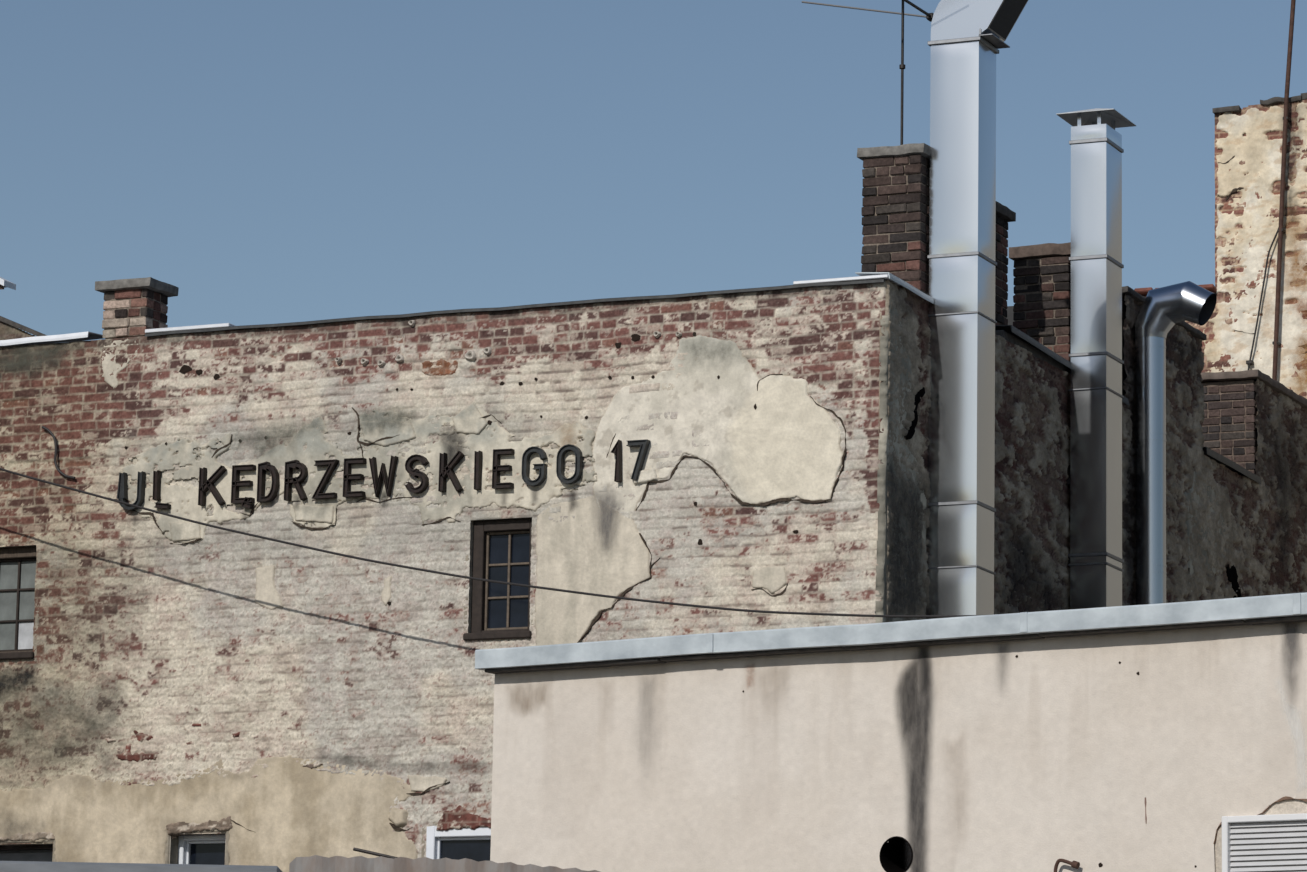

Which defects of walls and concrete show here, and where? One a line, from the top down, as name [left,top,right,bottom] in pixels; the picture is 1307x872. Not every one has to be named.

peeling [122,335,844,646]